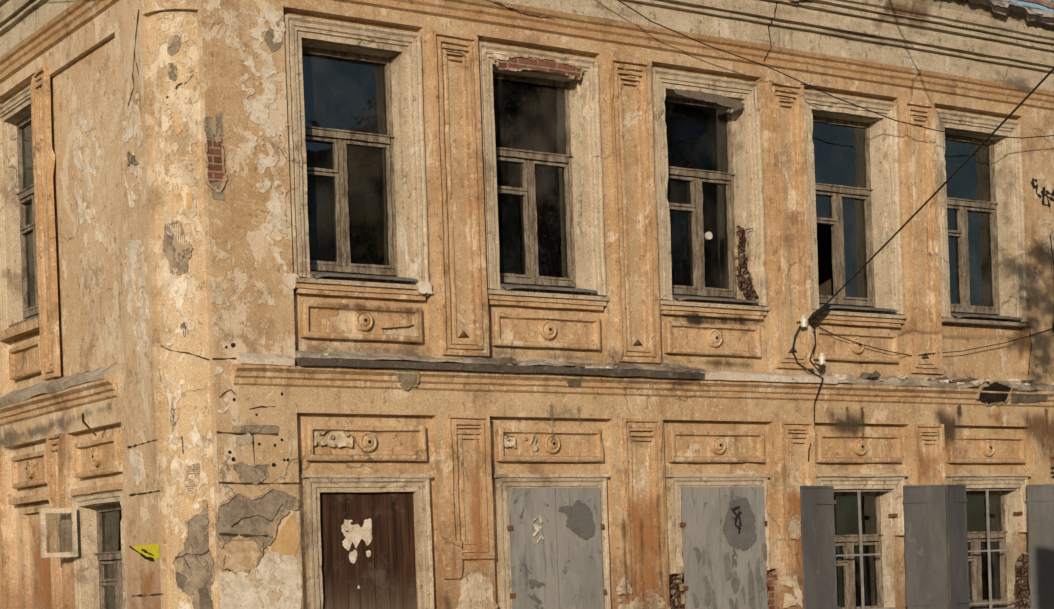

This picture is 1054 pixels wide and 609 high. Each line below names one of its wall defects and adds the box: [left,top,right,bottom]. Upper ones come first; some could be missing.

flaking render [493,52,584,80]
crack [764,2,778,62]
peeling [73,109,111,297]
peeling [122,94,143,209]
peeling [155,11,228,346]
peeling [227,6,298,290]
peeling [123,240,150,353]
flaking render [734,225,759,300]
peeling [165,366,302,609]
peeling [456,566,498,609]
peeling [616,542,803,609]
flaking render [1016,552,1030,609]